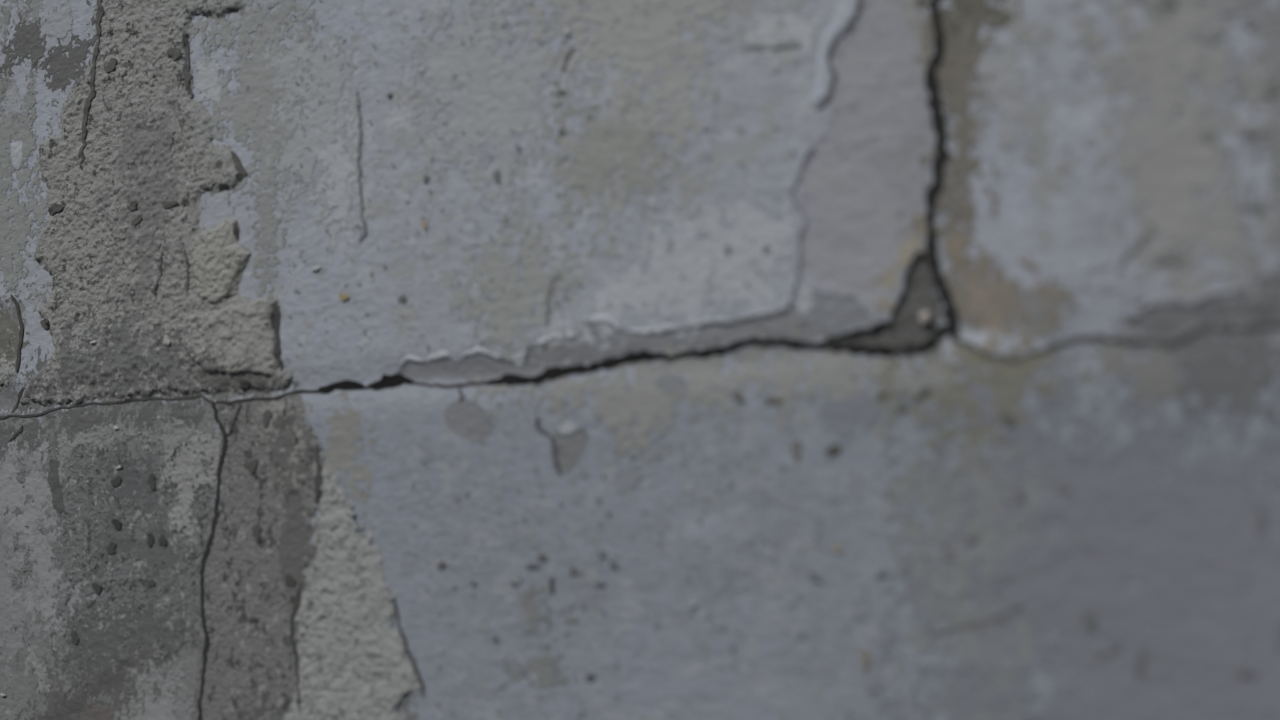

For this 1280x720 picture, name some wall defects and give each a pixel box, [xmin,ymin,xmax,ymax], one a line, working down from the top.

crack [79,0,104,169]
crack [182,34,193,98]
crack [231,220,239,238]
crack [231,151,248,181]
crack [355,90,367,242]
crack [485,0,1280,386]
crack [153,248,189,295]
crack [11,294,23,372]
spalling [0,0,429,720]
crack [270,300,283,371]
crack [535,415,562,476]
crack [0,374,488,720]